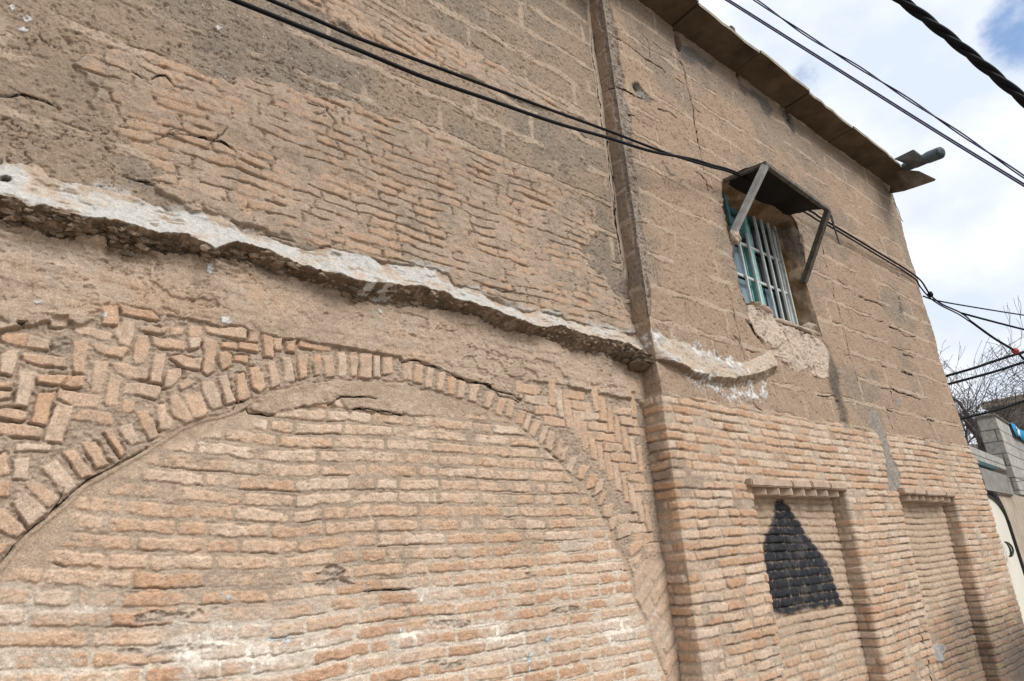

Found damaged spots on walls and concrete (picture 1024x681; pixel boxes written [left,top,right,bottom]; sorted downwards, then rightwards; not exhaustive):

crack [132,72,190,91]
crack [1,93,57,109]
crack [160,128,232,150]
spalling [48,334,73,357]
peeling [746,305,830,379]
crack [403,360,520,403]
crack [327,396,401,416]
crack [0,451,143,562]